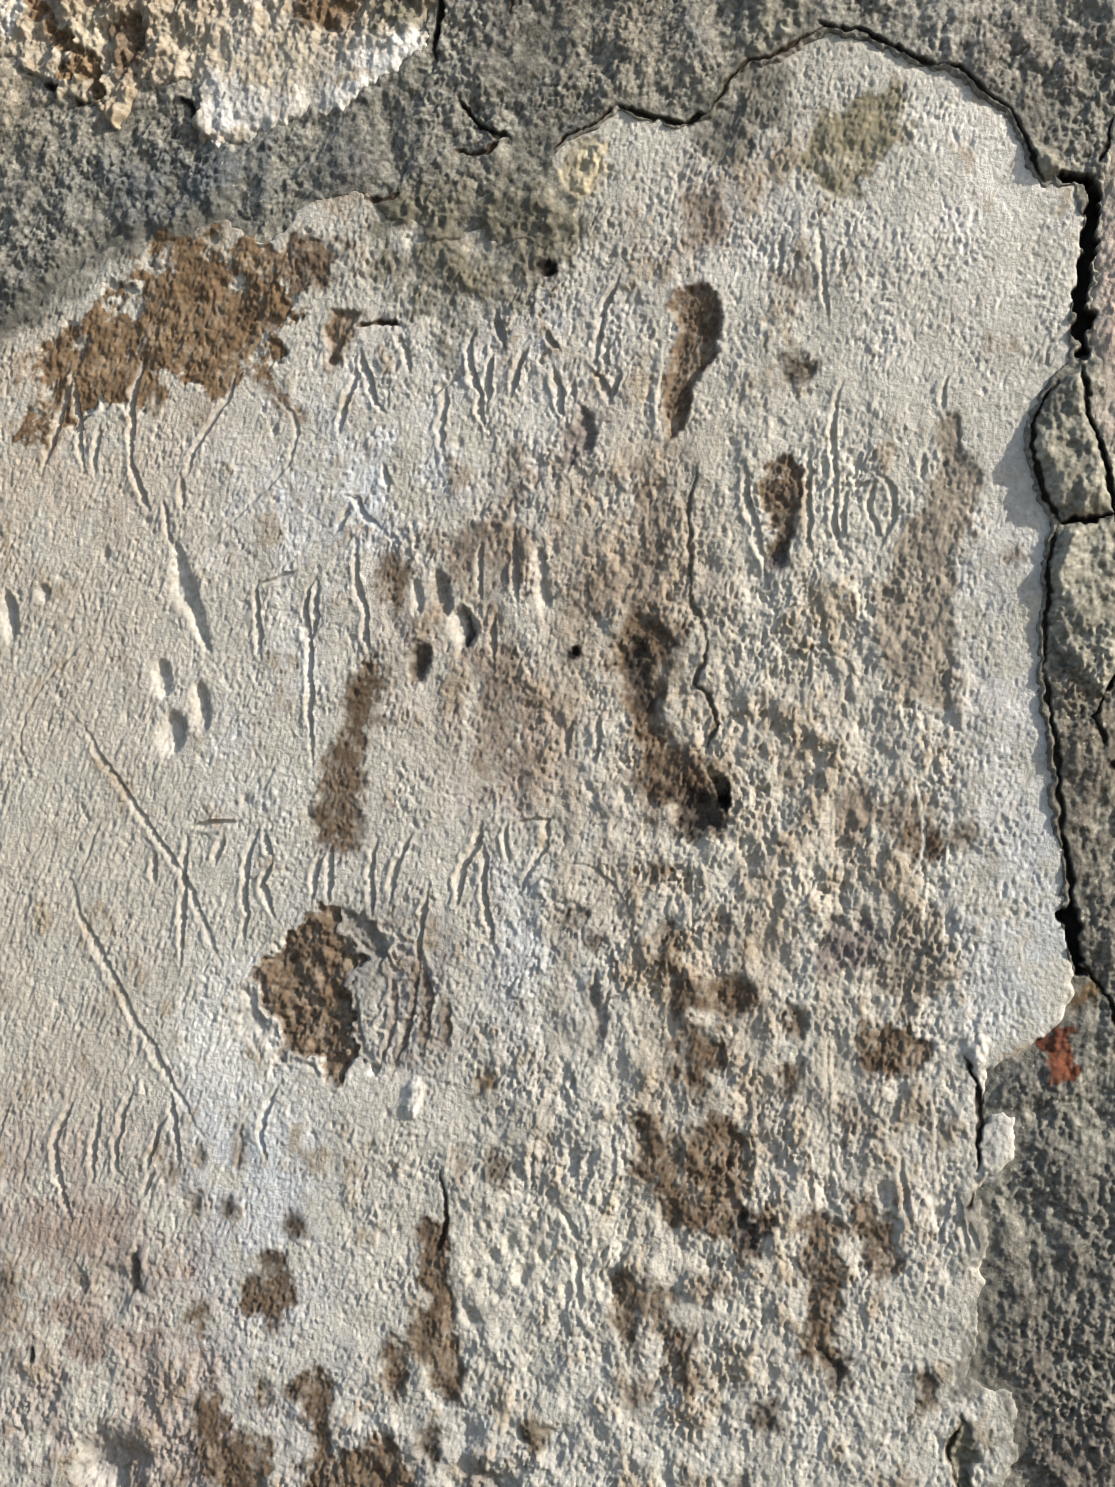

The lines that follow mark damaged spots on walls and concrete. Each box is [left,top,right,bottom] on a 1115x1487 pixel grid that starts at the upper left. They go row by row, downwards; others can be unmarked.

spalling [24,0,148,107]
crack [457,101,510,156]
spalling [325,311,400,365]
spalling [538,256,558,277]
damp [429,444,535,610]
crack [554,23,1115,1025]
damp [573,457,731,838]
damp [311,659,396,854]
spalling [232,901,386,1087]
corrosion [1036,1025,1080,1085]
crack [966,1060,984,1210]
crack [436,1174,449,1251]